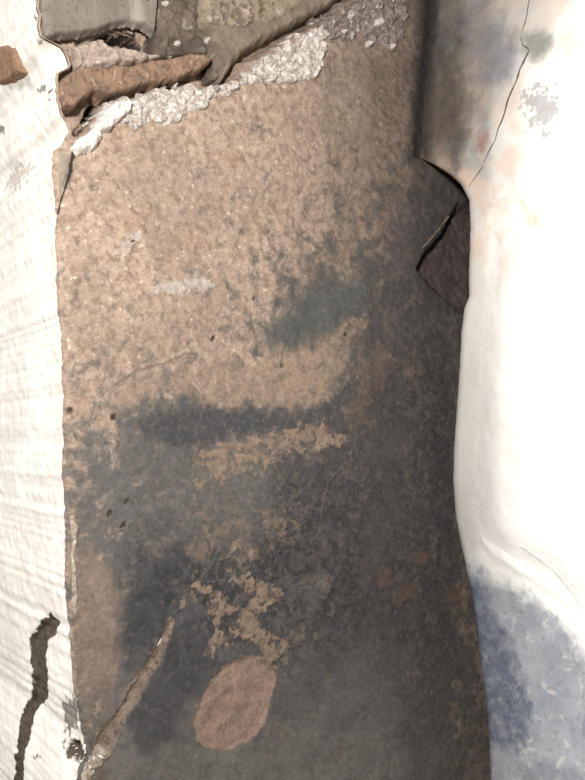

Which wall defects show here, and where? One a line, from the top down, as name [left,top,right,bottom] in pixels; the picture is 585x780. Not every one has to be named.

spalling [94,0,409,130]
crack [469,0,531,187]
peeling [58,154,69,195]
damp [112,230,147,258]
efflorescence [151,269,218,300]
damp [263,271,374,364]
damp [124,368,361,449]
peeling [13,515,176,780]